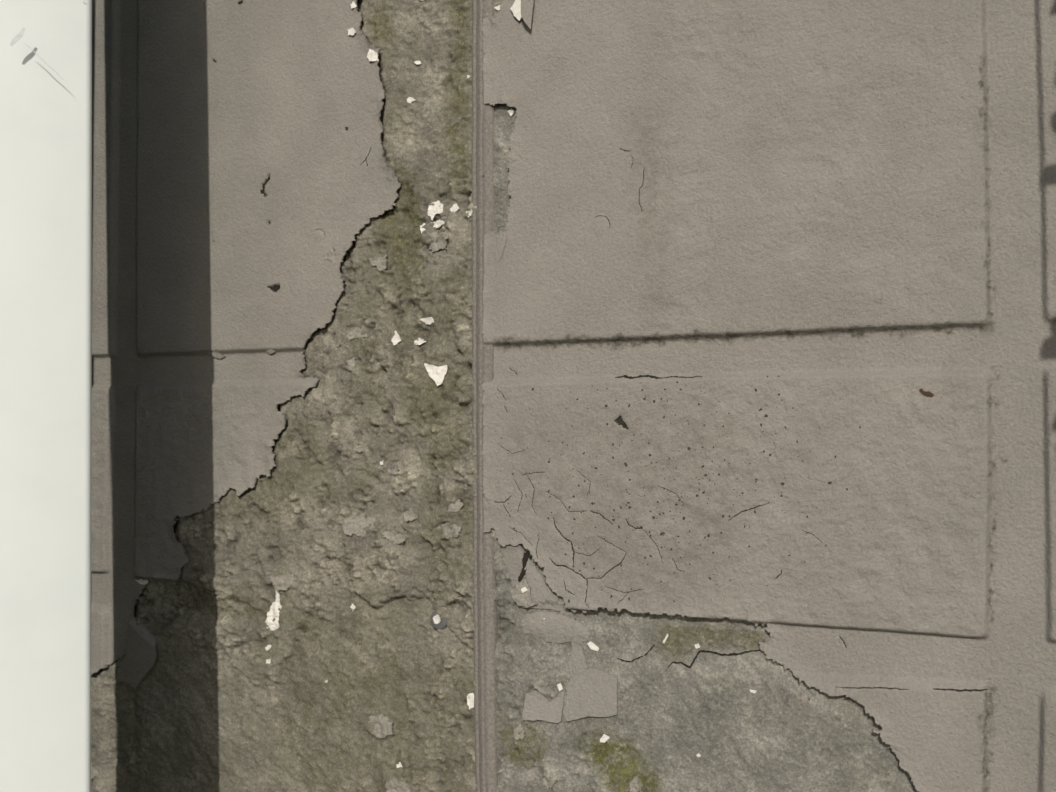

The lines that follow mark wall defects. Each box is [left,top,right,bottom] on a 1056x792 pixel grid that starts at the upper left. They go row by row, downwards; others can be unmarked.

peeling [91,0,920,792]
crack [495,444,684,608]
crack [617,645,760,668]